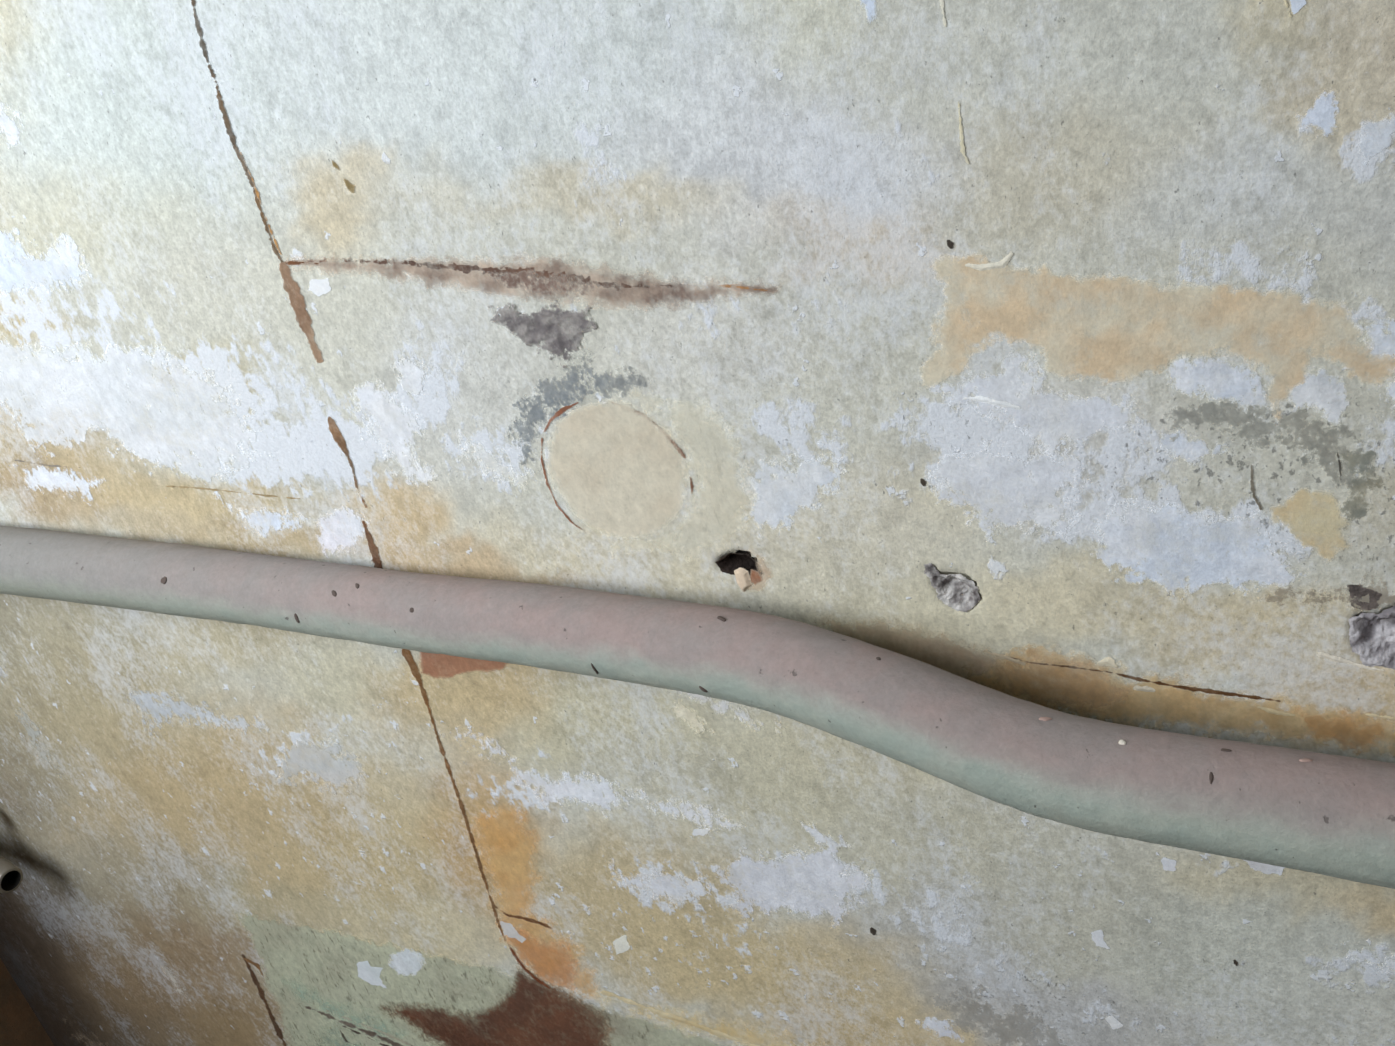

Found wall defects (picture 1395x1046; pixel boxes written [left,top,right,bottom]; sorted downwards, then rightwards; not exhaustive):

crack [191,0,323,363]
peeling [0,228,92,295]
peeling [0,333,370,558]
crack [166,486,299,499]
crack [328,417,383,569]
spalling [924,563,981,612]
flaking render [920,252,1395,541]
peeling [1092,489,1348,599]
spalling [1317,584,1395,671]
crack [402,649,552,941]
crack [242,954,413,1046]
rust [381,809,607,1046]